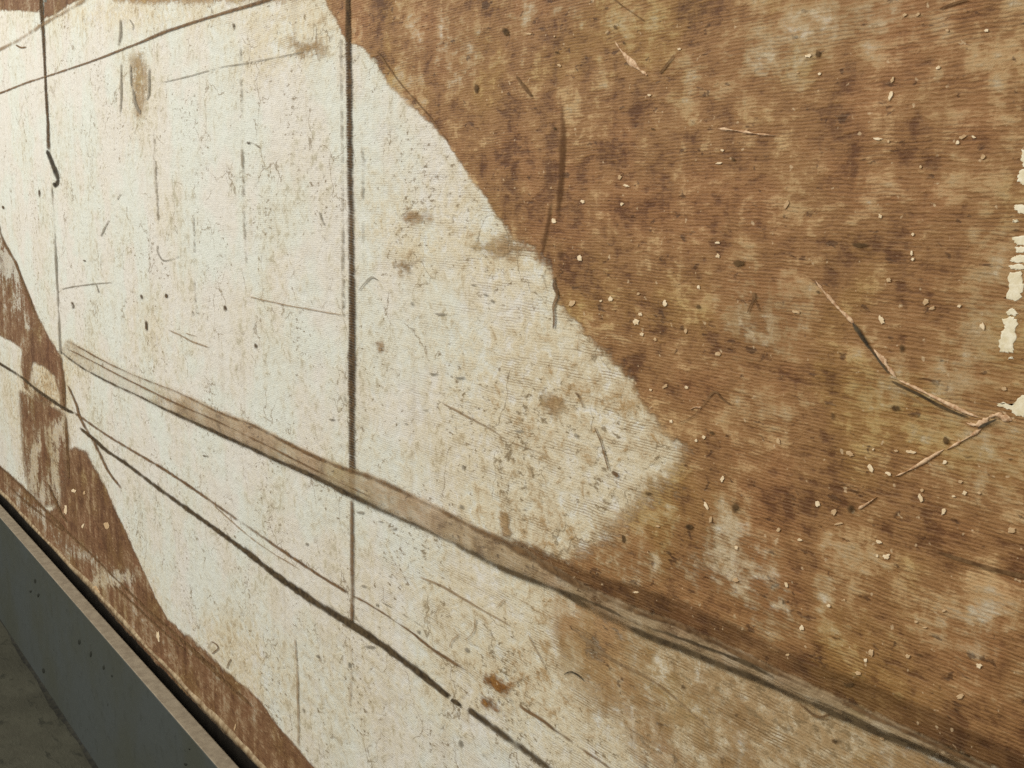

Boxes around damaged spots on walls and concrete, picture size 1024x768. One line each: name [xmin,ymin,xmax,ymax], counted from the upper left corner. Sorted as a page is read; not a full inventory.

water stain [326,0,1024,768]
crack [815,280,1012,477]
peeling [997,387,1024,417]
peeling [998,236,1024,359]
water stain [0,239,314,768]